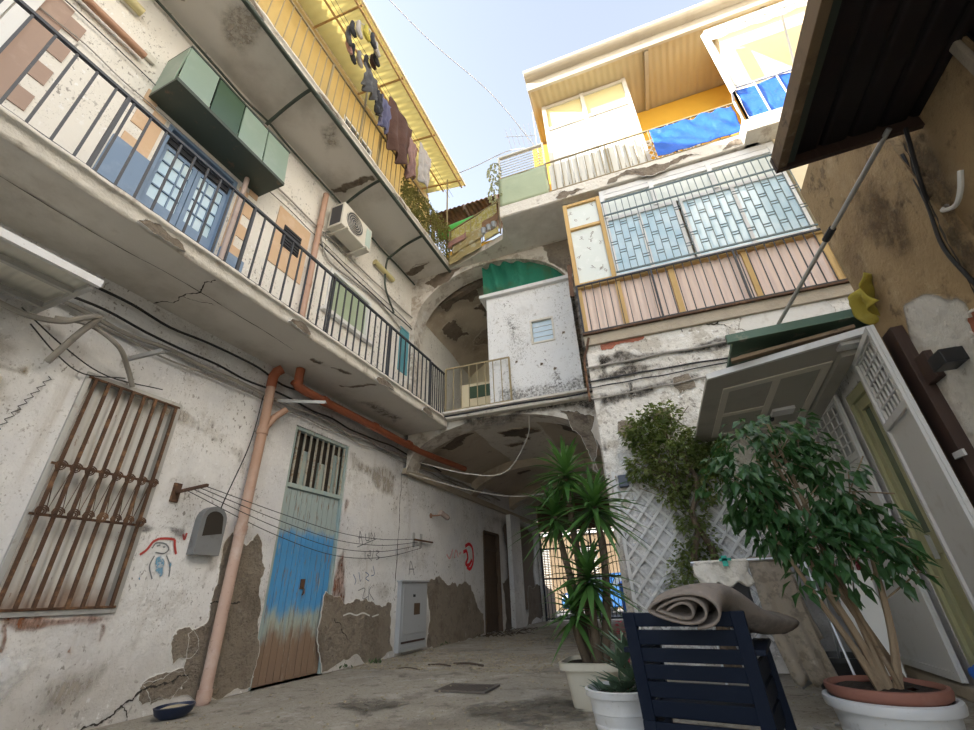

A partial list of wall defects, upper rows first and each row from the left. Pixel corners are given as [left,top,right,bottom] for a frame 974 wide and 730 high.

spalling [606,154,700,185]
crack [0,176,284,344]
spalling [137,219,186,252]
peeling [405,262,488,346]
spalling [965,308,974,344]
spalling [137,532,233,706]
spalling [316,591,392,673]
crack [80,674,189,730]